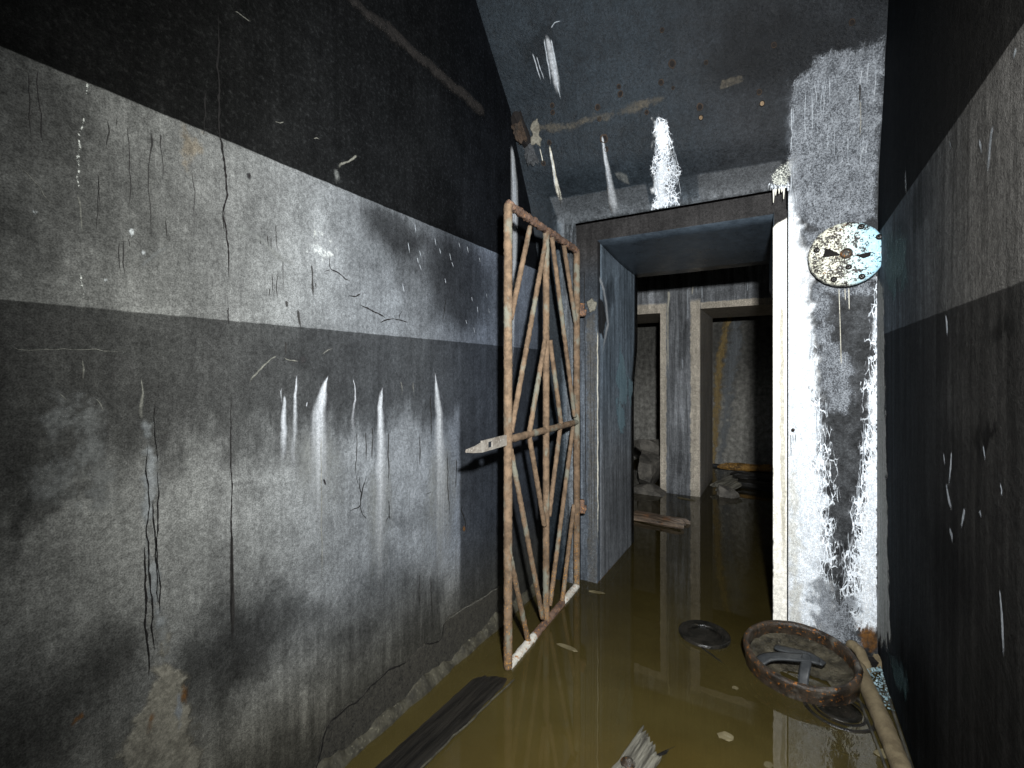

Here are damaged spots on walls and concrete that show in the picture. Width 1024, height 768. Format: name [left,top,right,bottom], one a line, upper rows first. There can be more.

leakage [533,39,559,91]
crack [204,18,229,273]
leakage [651,118,681,210]
leakage [768,37,891,648]
leakage [282,379,327,441]
leakage [355,392,389,499]
leakage [419,376,441,461]
crack [143,410,165,671]